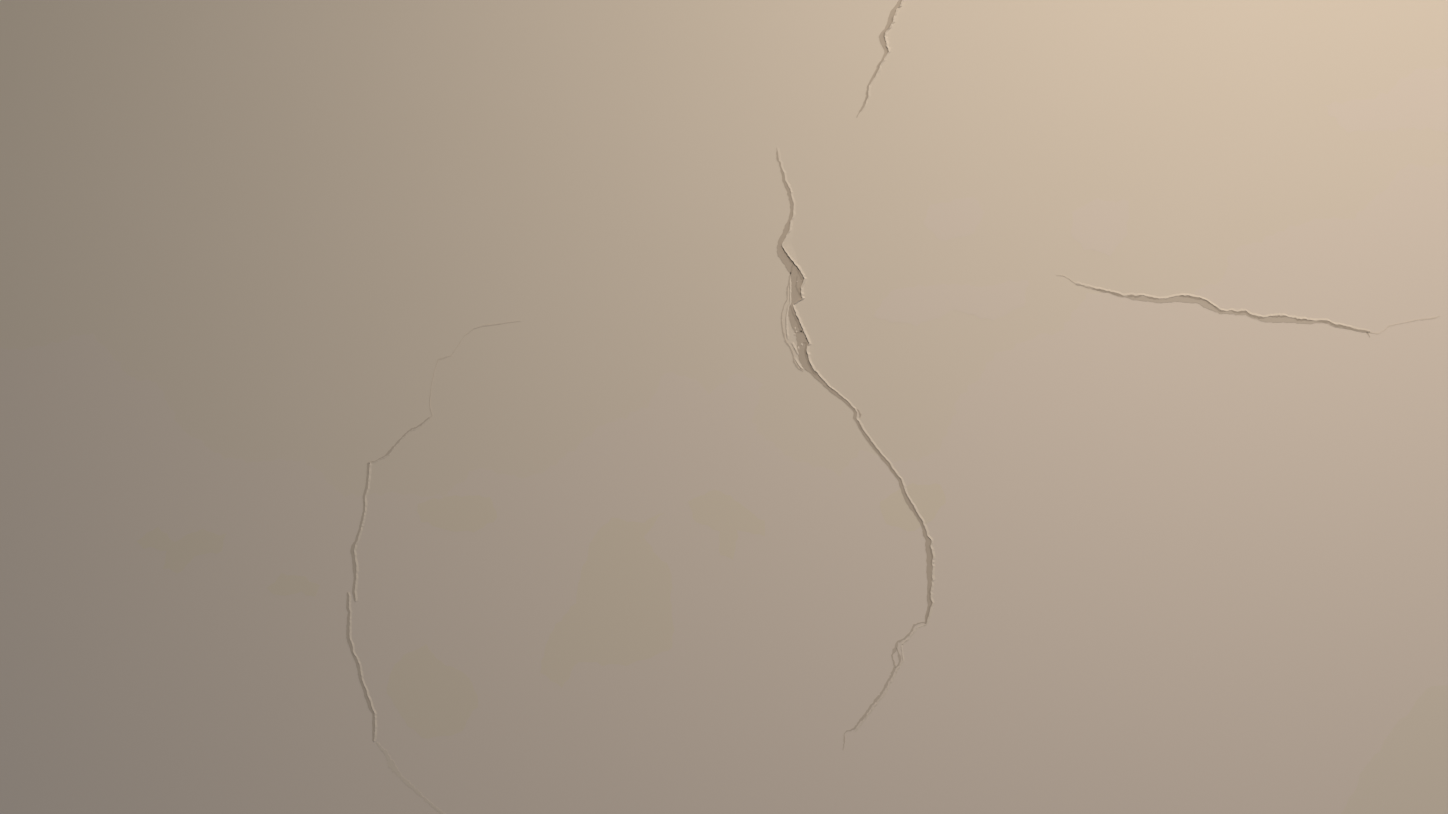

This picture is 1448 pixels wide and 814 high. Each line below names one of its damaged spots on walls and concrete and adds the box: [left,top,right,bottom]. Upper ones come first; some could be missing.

crack [856,0,905,118]
crack [1056,275,1439,337]
crack [776,148,936,748]